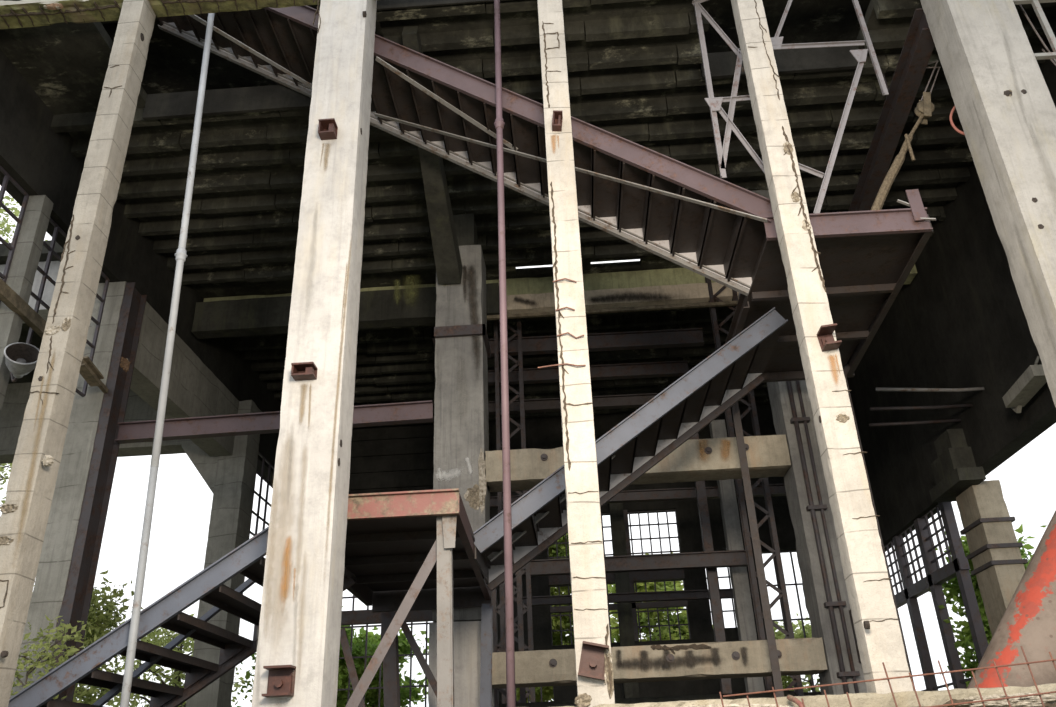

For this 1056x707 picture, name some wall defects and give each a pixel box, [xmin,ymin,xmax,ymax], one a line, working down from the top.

crack [782,126,826,292]
crack [550,182,598,494]
rust [282,538,295,597]
crack [575,608,612,699]